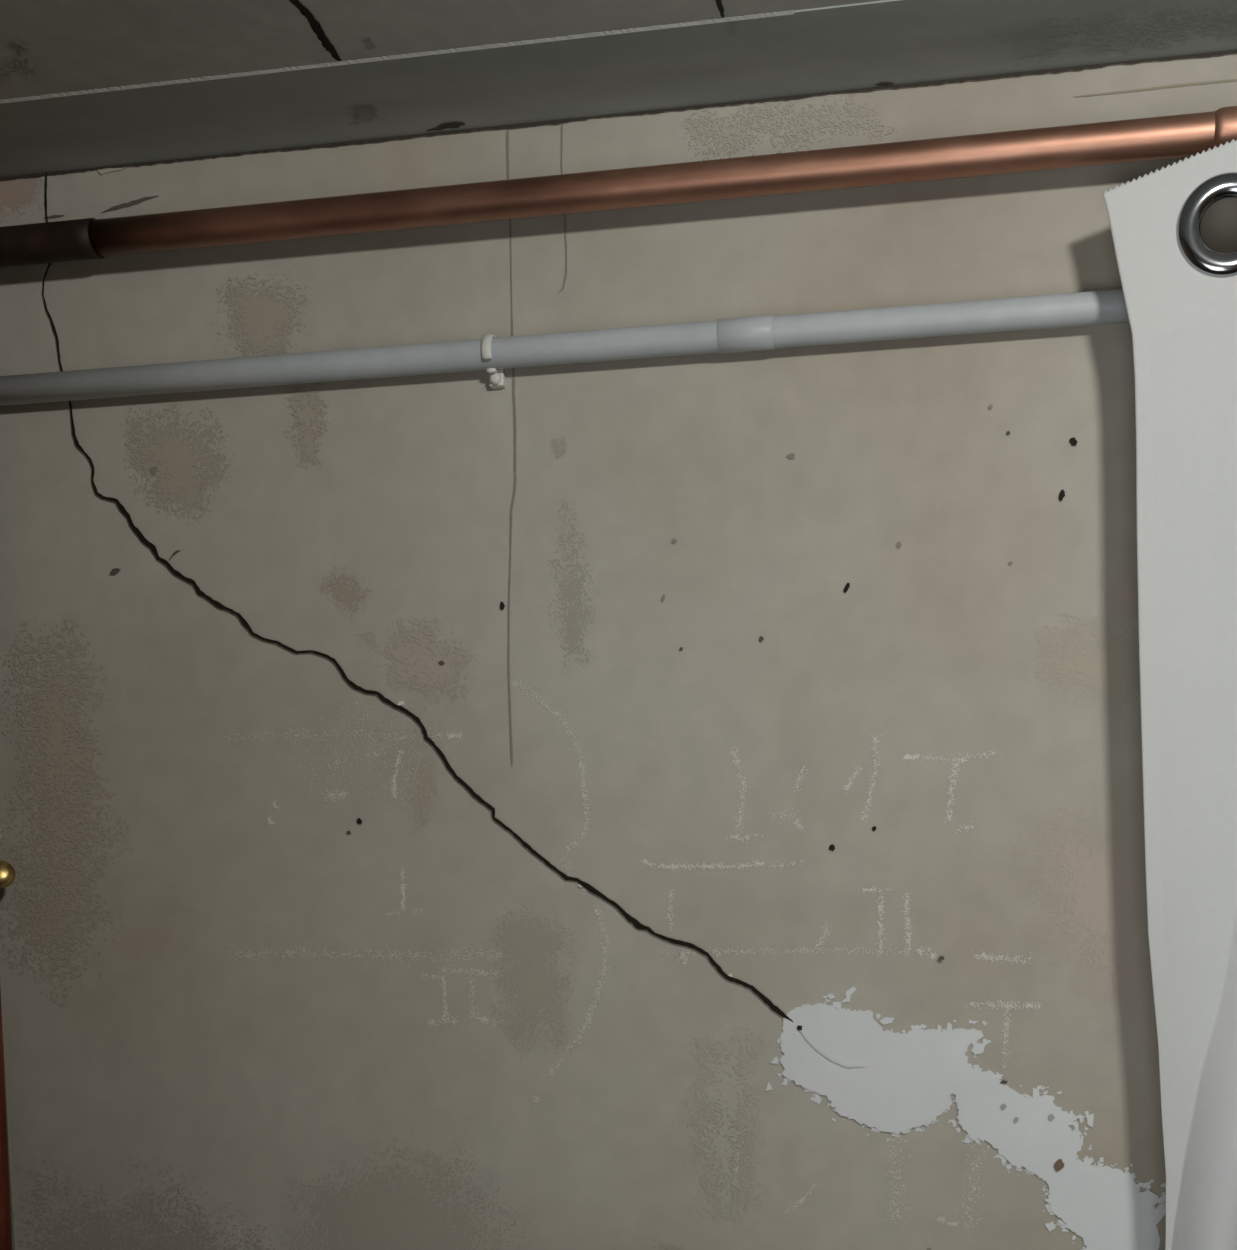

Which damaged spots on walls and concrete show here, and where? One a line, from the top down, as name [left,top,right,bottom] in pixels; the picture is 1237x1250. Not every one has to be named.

crack [289,0,341,61]
crack [715,0,724,18]
crack [42,263,63,371]
crack [507,219,515,336]
crack [558,214,567,293]
crack [69,368,866,1068]